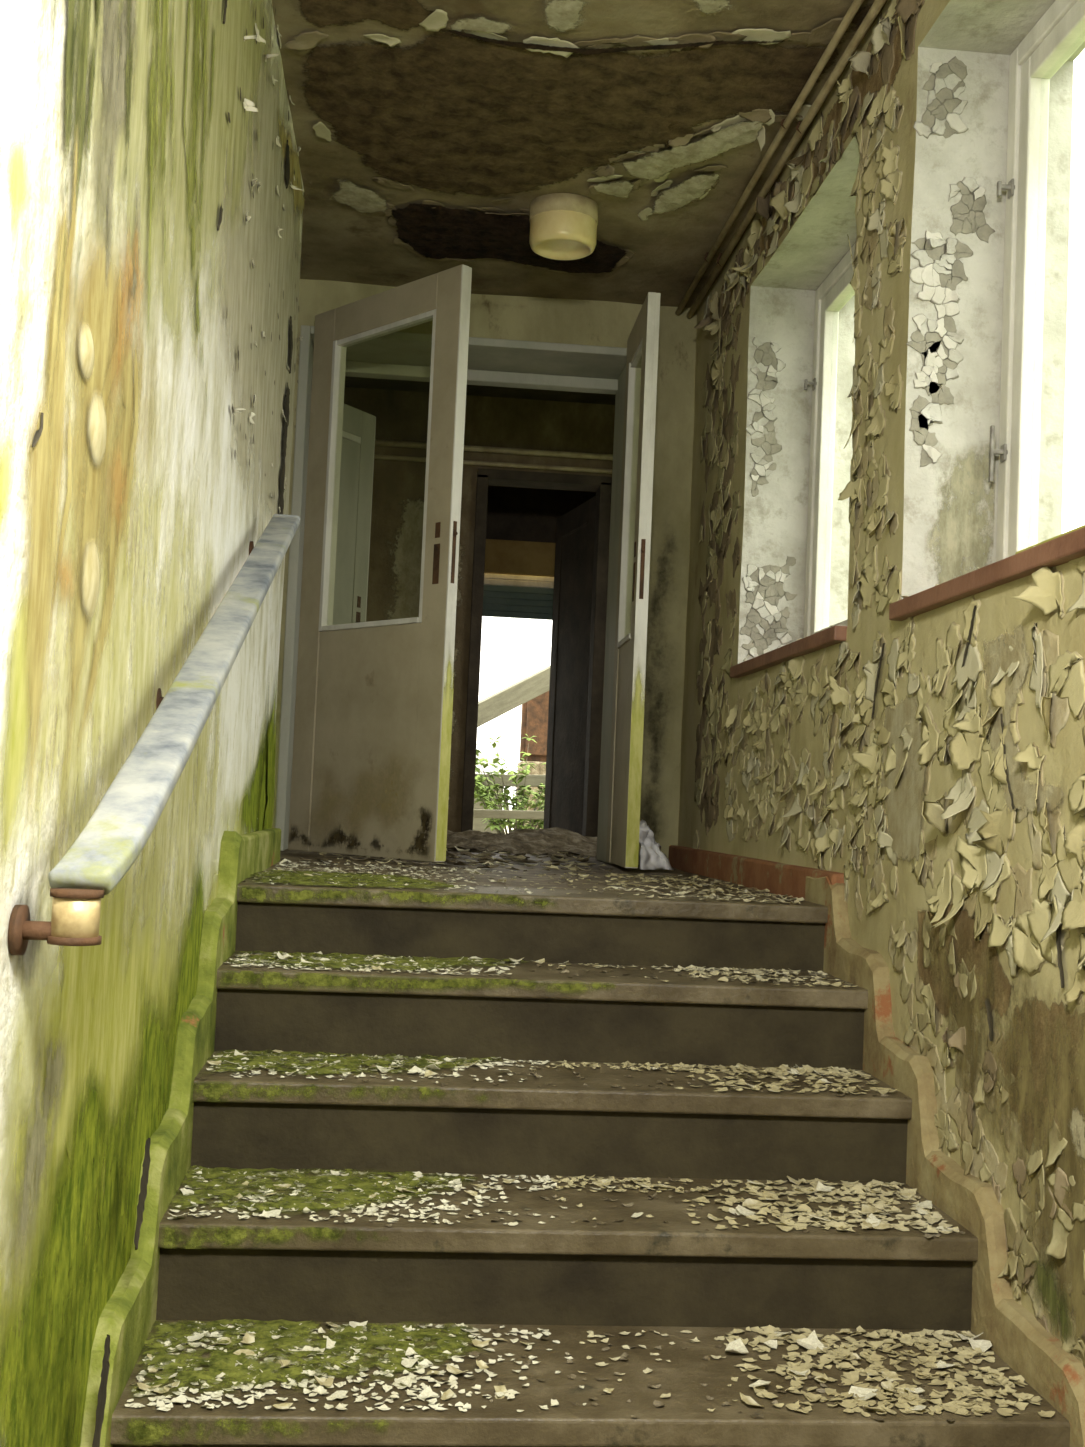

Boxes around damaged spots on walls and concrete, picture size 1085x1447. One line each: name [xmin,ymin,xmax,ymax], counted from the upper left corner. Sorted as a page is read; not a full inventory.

peeling [228,88,258,123]
leakage [222,0,305,517]
leakage [0,448,11,532]
leakage [3,0,215,842]
peeling [232,394,256,467]
spalling [243,0,1085,1364]
leakage [23,940,40,973]
leakage [19,1043,63,1237]
leakage [927,926,1085,1368]